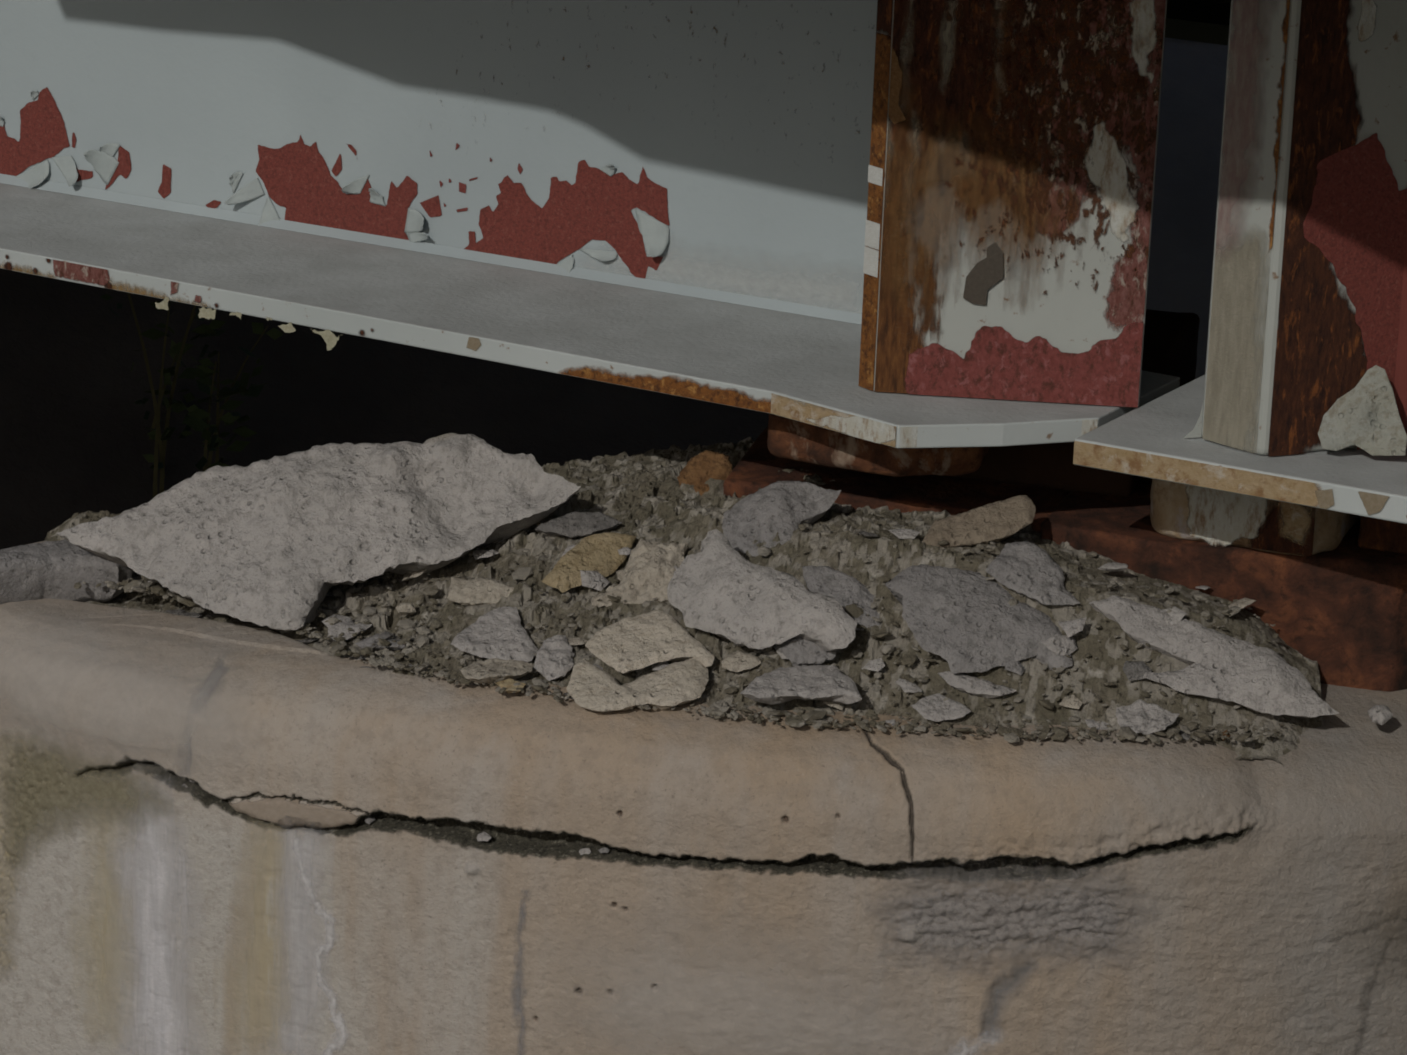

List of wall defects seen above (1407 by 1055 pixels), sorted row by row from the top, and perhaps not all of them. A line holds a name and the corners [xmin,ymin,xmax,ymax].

peeling [0,87,131,190]
peeling [206,135,670,279]
corrosion [858,0,1056,394]
corrosion [1268,0,1367,457]
peeling [1303,133,1407,456]
corrosion [560,367,771,413]
corrosion [1250,500,1316,556]
crack [82,729,1250,883]
water stain [10,756,184,1055]